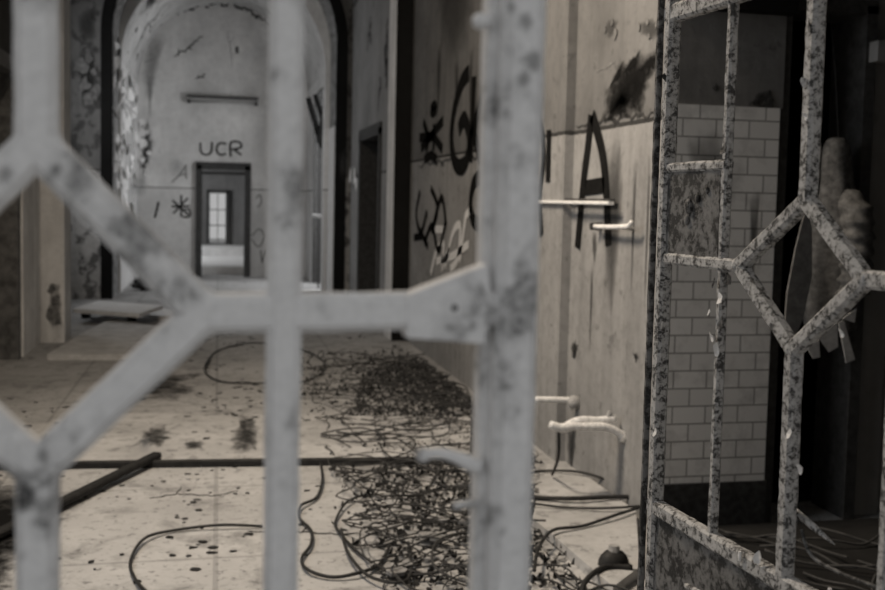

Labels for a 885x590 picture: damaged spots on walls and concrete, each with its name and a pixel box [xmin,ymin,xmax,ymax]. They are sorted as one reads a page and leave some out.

peeling [74,54,101,105]
peeling [113,35,152,211]